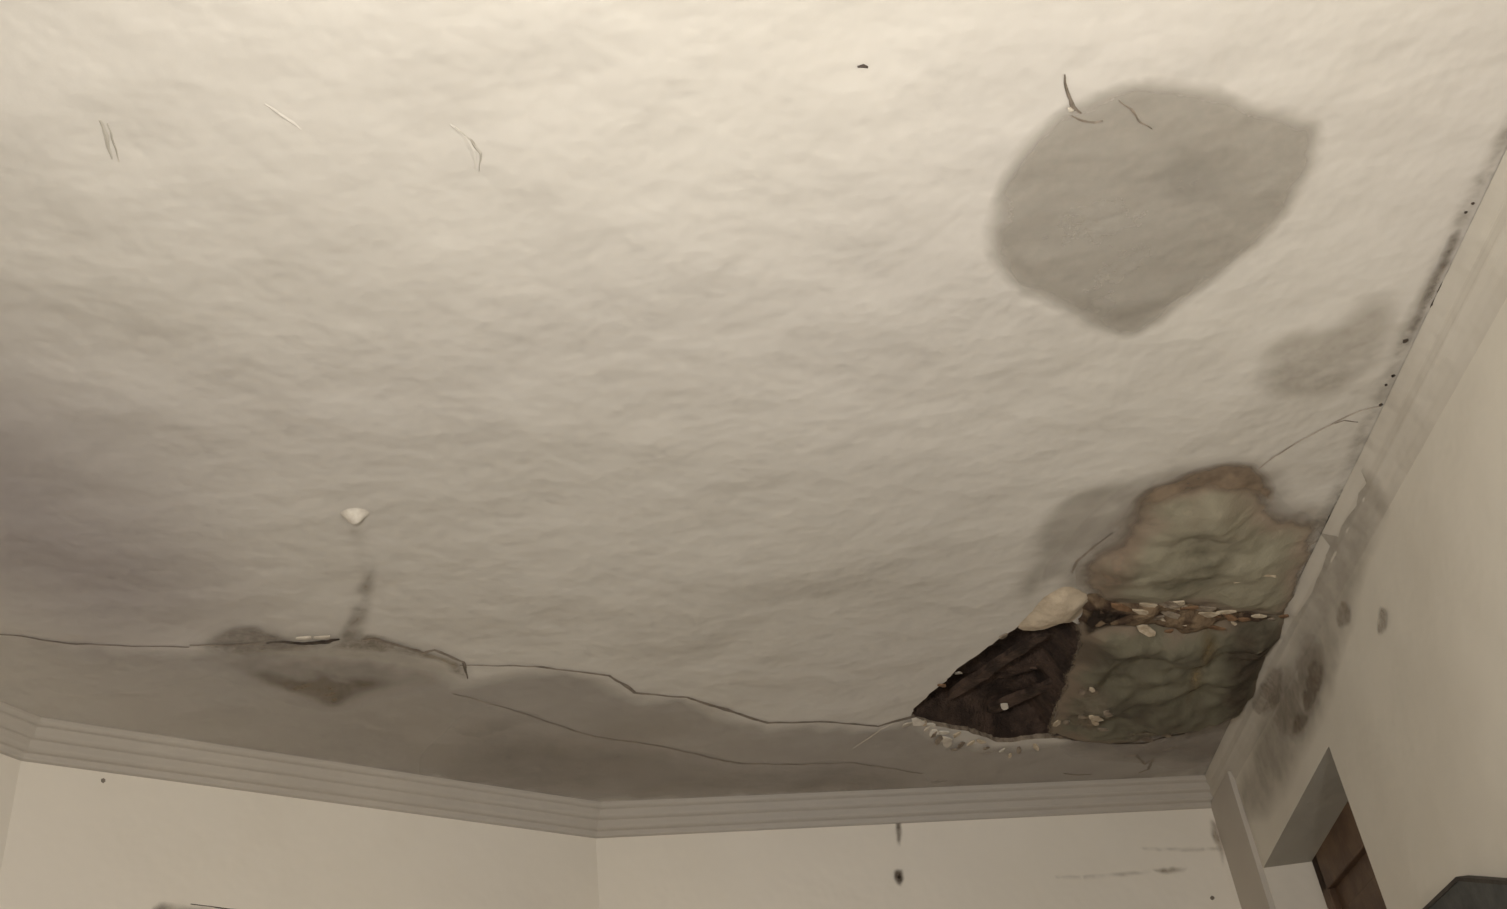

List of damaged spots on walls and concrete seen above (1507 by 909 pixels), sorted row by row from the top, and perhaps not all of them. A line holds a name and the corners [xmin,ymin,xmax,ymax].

damp [1002,91,1308,332]
damp [1403,249,1452,343]
spalling [902,587,1289,744]